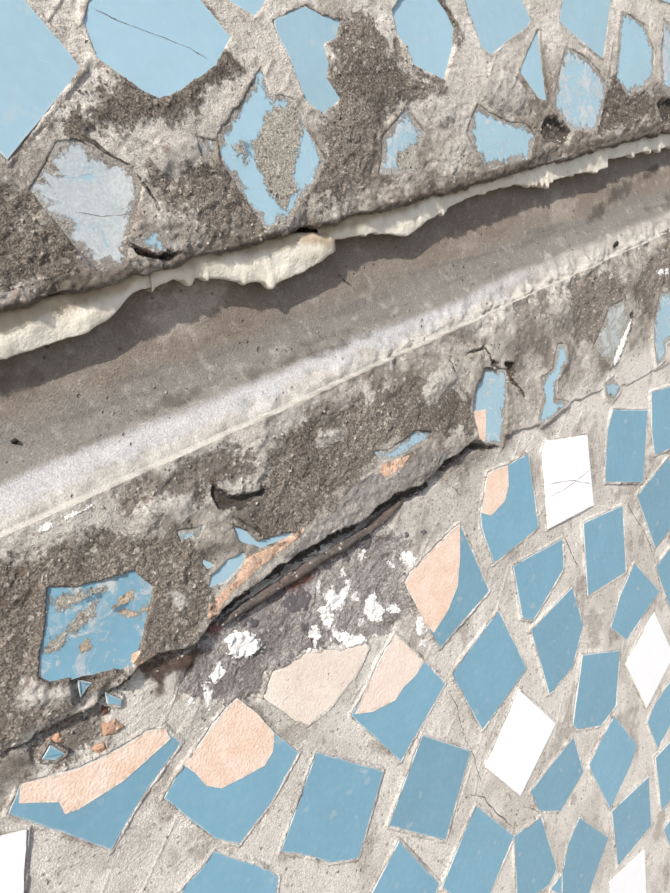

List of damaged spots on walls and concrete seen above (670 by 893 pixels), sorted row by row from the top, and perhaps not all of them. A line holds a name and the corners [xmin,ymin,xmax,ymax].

spalling [46,48,247,143]
spalling [313,10,448,206]
spalling [541,116,571,144]
spalling [597,73,670,135]
spalling [0,183,79,289]
spalling [144,156,257,244]
crack [450,346,525,397]
spalling [0,375,476,771]
crack [215,440,499,619]
crack [64,675,132,720]